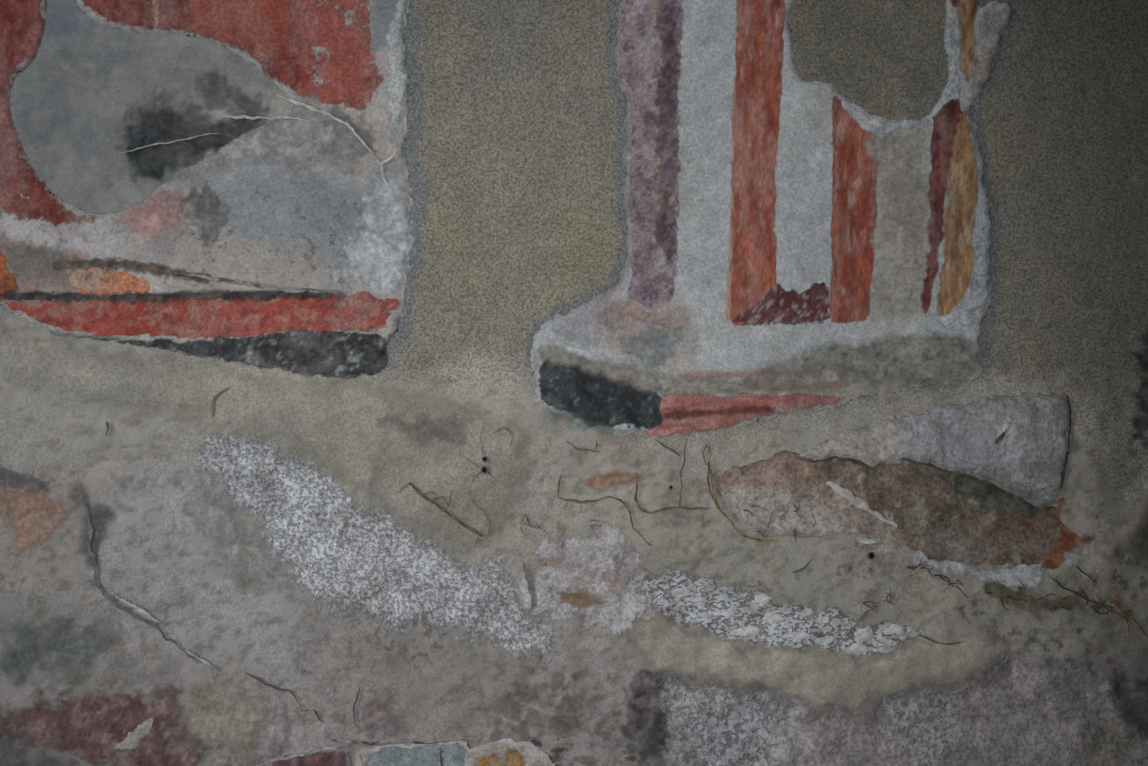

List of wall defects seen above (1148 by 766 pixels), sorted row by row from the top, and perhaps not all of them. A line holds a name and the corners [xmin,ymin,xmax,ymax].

flaking render [10,0,337,213]
spalling [384,0,407,146]
flaking render [788,0,1010,332]
crack [557,439,708,546]
spalling [717,450,1061,566]
crack [80,484,477,766]
crack [523,563,536,616]